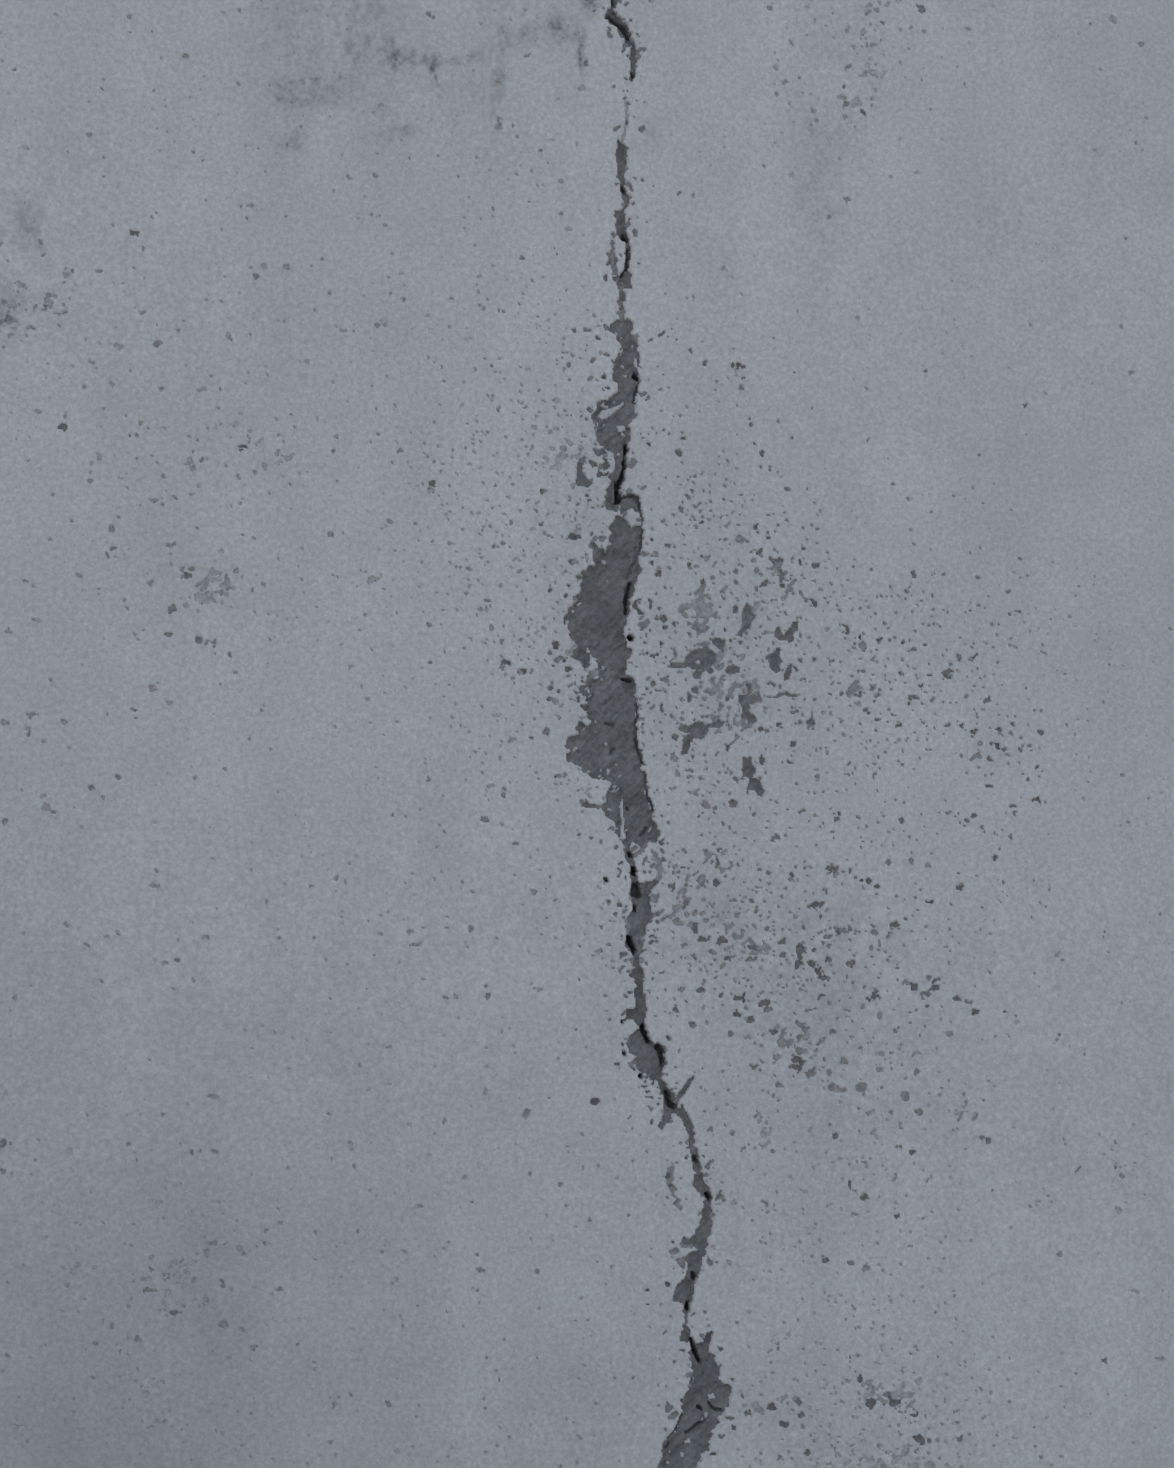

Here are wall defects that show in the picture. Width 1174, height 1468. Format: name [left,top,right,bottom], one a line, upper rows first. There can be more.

crack [561,0,695,641]
hole [767,0,971,160]
hole [85,1208,286,1404]
crack [548,650,744,1448]
flaking render [367,212,1104,1468]